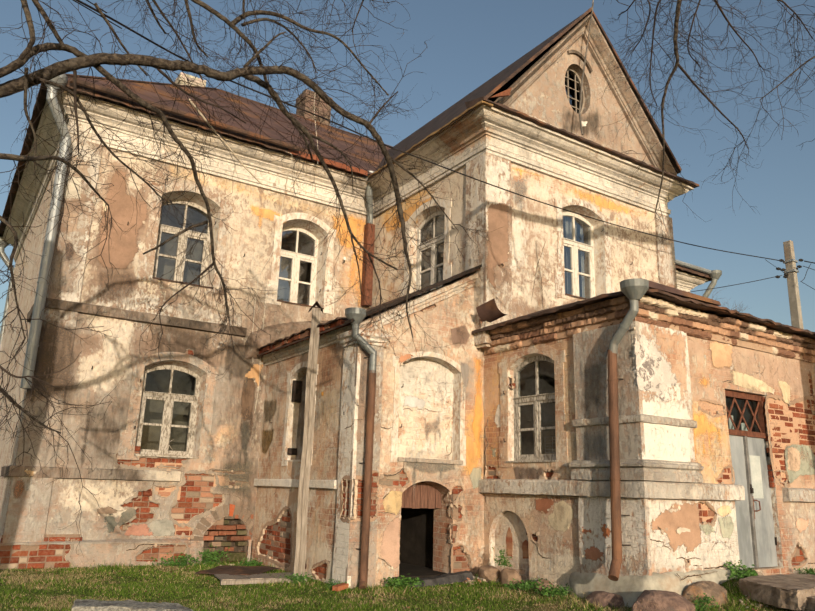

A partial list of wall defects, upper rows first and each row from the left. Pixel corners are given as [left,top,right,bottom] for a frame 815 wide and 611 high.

peeling [98,170,148,269]
peeling [486,203,509,289]
damp [38,320,72,395]
peeling [633,327,677,402]
flaking render [709,341,815,488]
flaking render [0,534,82,570]
flaking render [97,446,251,566]
flaking render [256,506,292,568]
flaking render [305,559,330,581]
flaking render [339,468,410,523]
flaking render [447,485,477,576]
peeling [650,500,731,568]